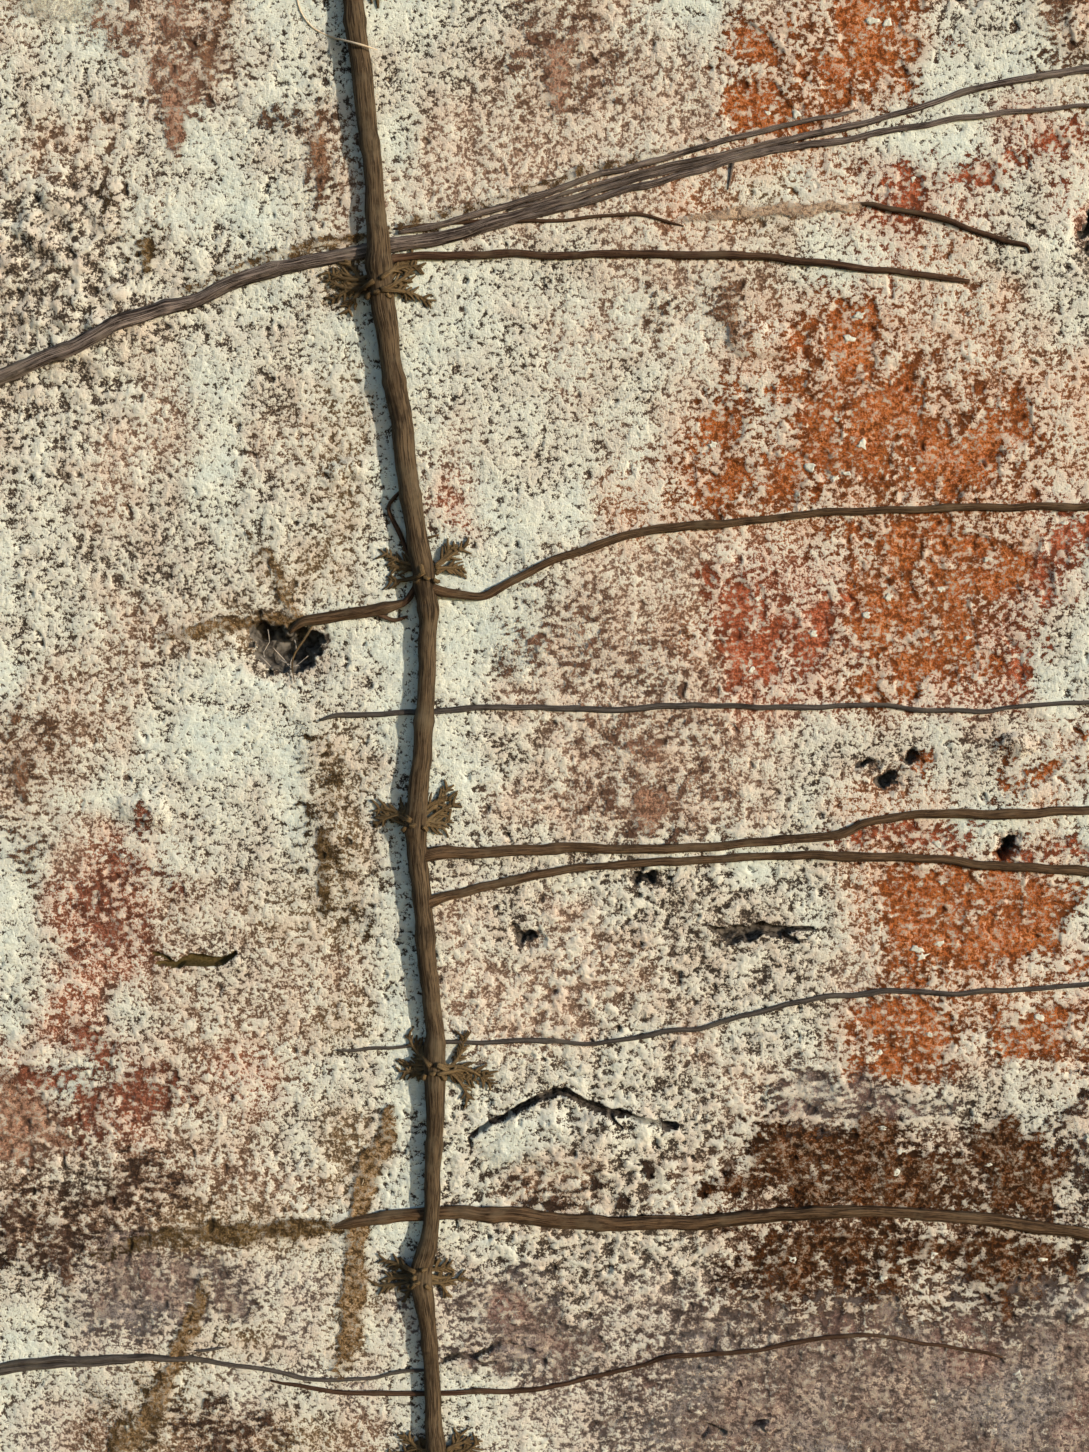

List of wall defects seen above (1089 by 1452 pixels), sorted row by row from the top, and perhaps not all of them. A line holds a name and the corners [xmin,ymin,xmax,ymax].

crack [708,921,814,947]
crack [152,951,237,969]
crack [470,1087,679,1138]